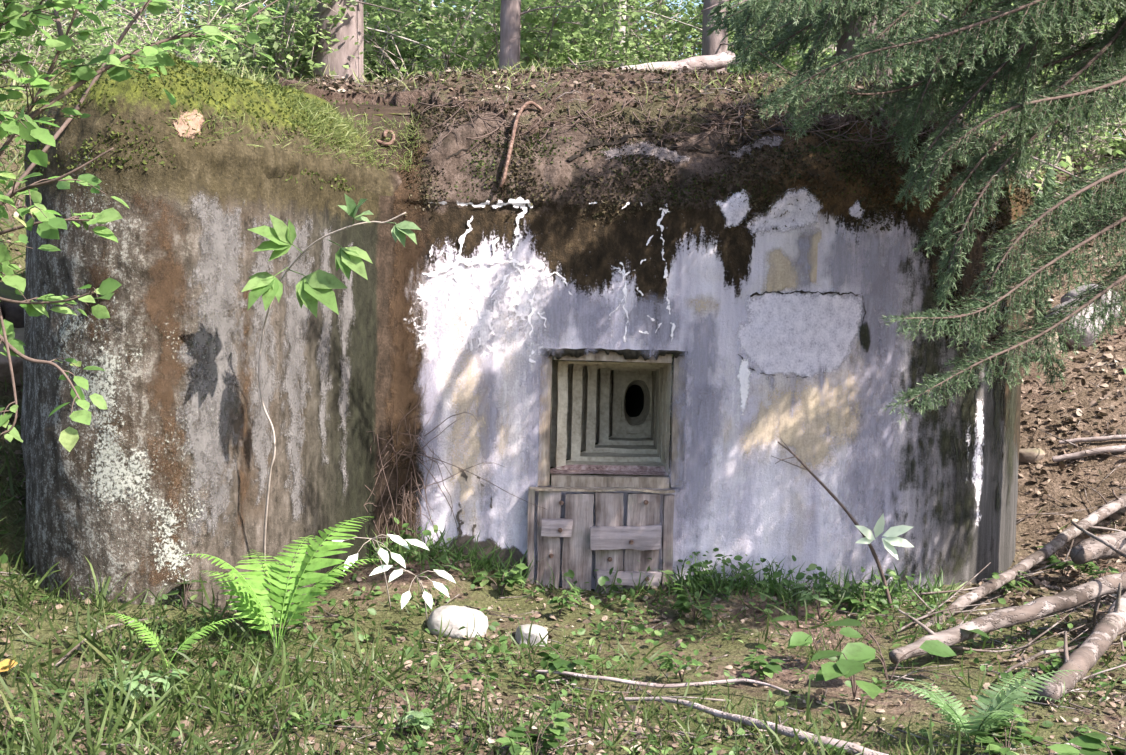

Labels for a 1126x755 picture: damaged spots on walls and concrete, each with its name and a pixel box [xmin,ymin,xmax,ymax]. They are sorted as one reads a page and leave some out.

peeling [717,189,820,233]
peeling [849,202,865,218]
water stain [176,194,355,543]
water stain [405,197,679,544]
water stain [675,315,722,571]
spalling [717,290,871,506]
water stain [829,204,1018,591]